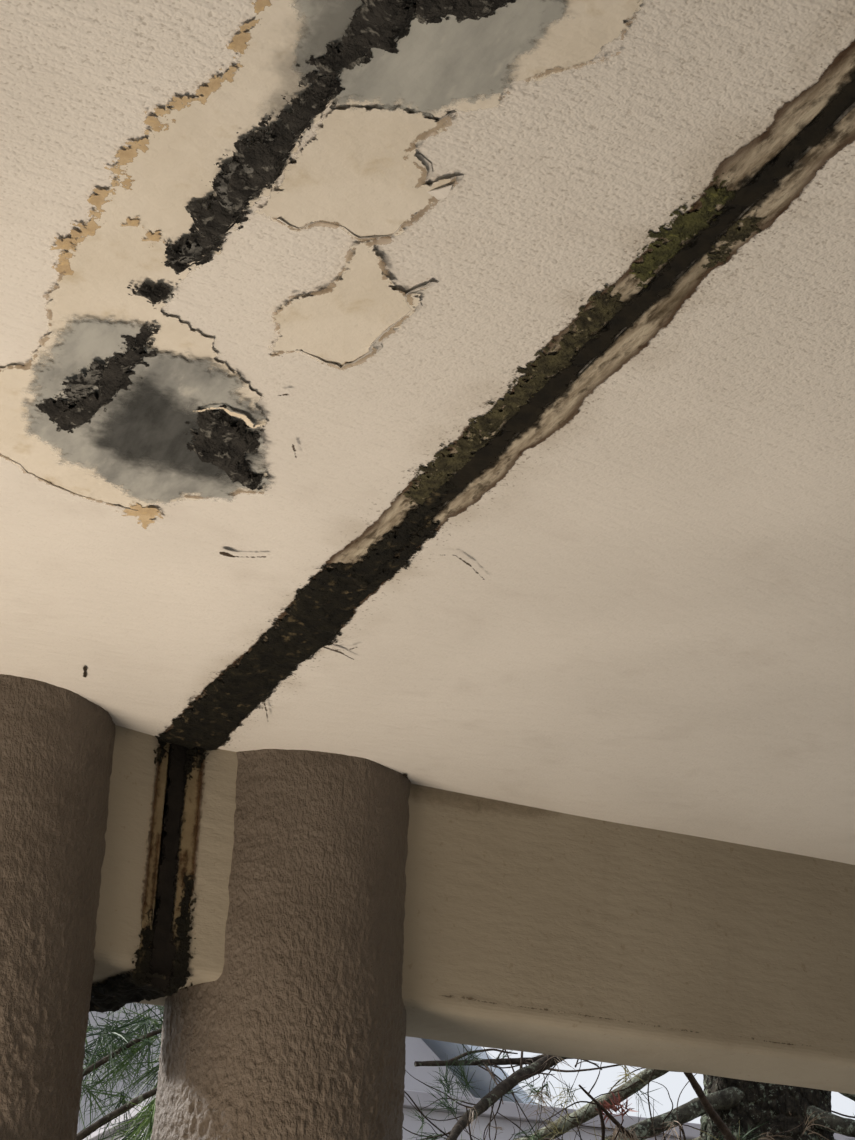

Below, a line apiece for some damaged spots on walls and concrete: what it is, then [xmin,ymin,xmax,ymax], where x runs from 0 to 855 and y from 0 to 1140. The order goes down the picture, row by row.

crack [164,0,516,275]
water stain [292,0,566,117]
peeling [0,0,643,529]
crack [36,324,159,433]
water stain [23,317,272,504]
crack [219,551,266,559]
water stain [89,71,855,1013]